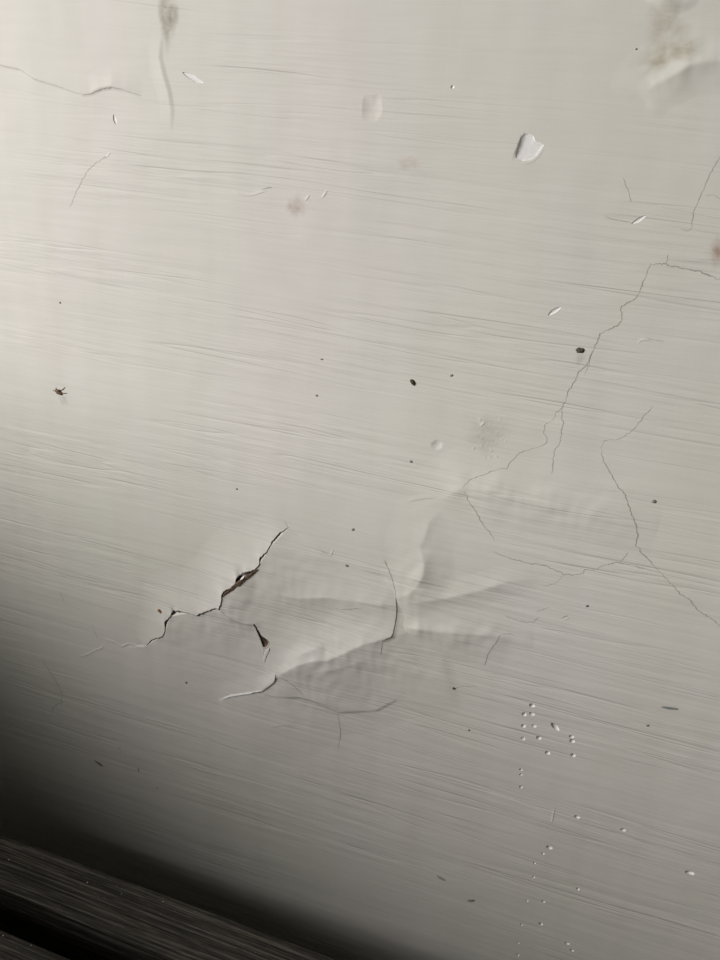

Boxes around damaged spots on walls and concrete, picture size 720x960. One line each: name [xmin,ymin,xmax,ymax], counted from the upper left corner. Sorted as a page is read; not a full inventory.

peeling [515,133,545,165]
crack [682,157,720,231]
crack [464,255,720,665]